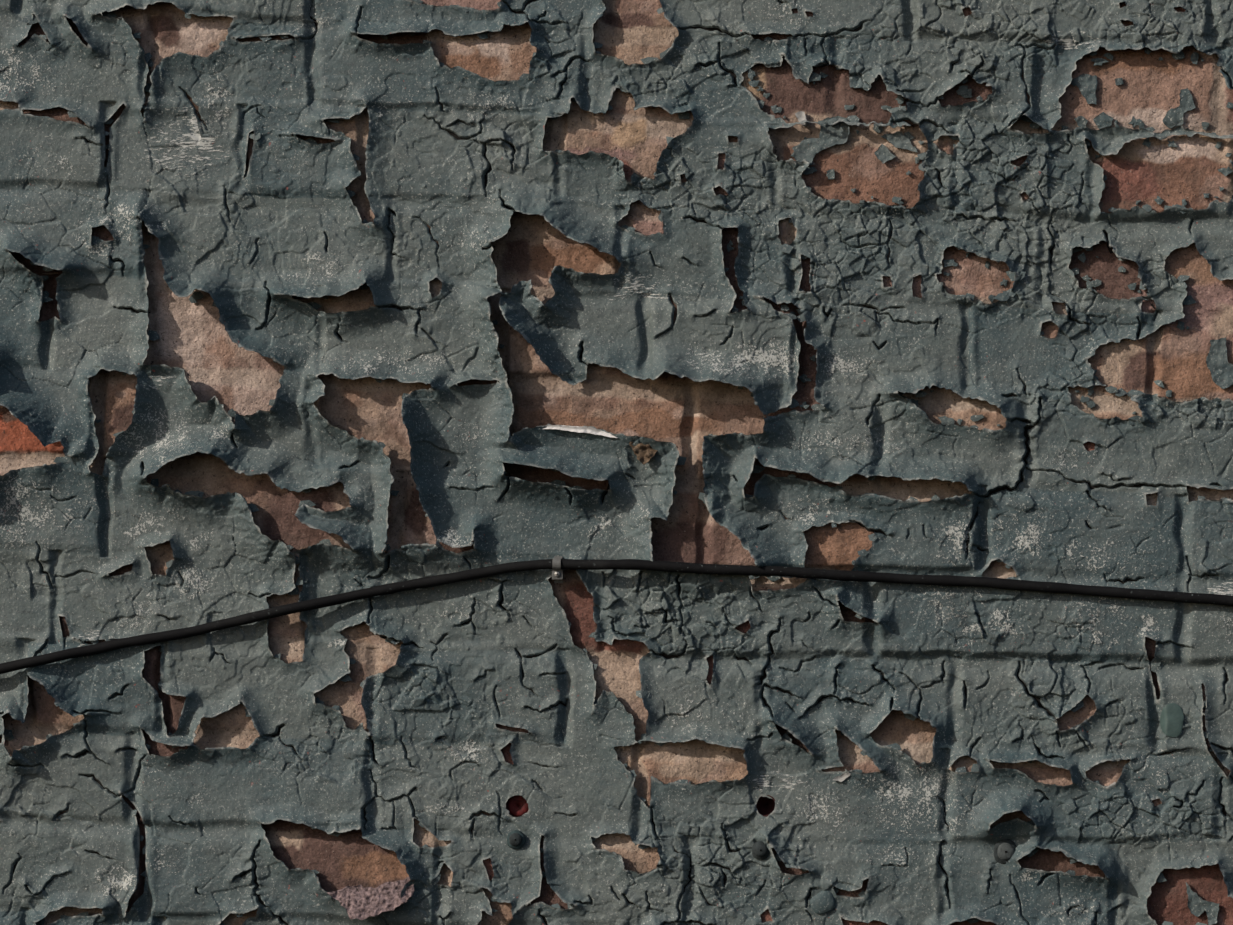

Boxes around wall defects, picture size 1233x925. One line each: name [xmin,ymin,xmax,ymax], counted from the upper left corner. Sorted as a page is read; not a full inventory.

crack [437,91,518,213]
peeling [543,88,694,182]
peeling [742,56,960,208]
peeling [1011,46,1233,214]
peeling [142,221,285,424]
peeling [458,211,877,591]
crack [965,383,1220,554]
peeling [1068,241,1233,425]
crack [736,631,859,711]
crack [1017,666,1057,720]
crack [71,748,141,797]
crack [627,818,736,925]